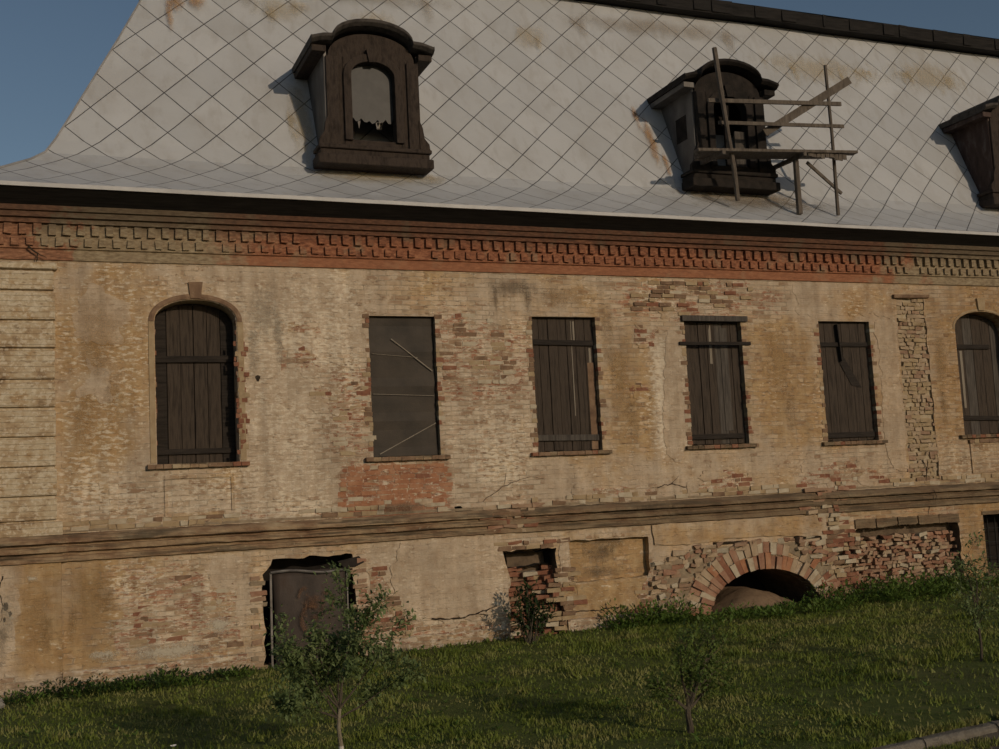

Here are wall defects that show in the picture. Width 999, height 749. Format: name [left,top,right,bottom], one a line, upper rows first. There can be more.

flaking render [281,320,329,379]
spalling [792,281,940,480]
flaking render [330,381,453,507]
flaking render [796,457,884,488]
flaking render [362,535,741,652]
spalling [762,511,964,599]